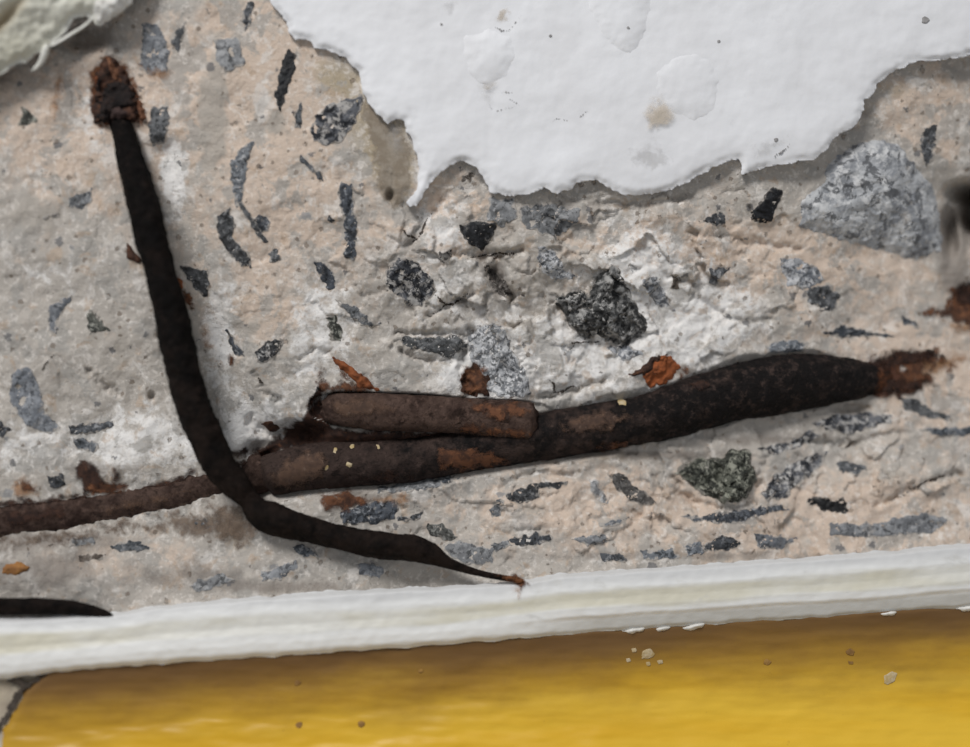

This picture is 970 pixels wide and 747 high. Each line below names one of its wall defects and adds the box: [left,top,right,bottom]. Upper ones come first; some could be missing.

corrosion [89,55,149,128]
corrosion [126,243,141,263]
spalling [0,0,970,579]
corrosion [922,282,970,330]
corrosion [232,357,442,489]
corrosion [460,362,530,438]
corrosion [562,409,625,433]
corrosion [629,354,709,390]
corrosion [869,347,964,398]
corrosion [0,460,195,524]
corrosion [321,490,407,512]
spalling [0,493,507,612]